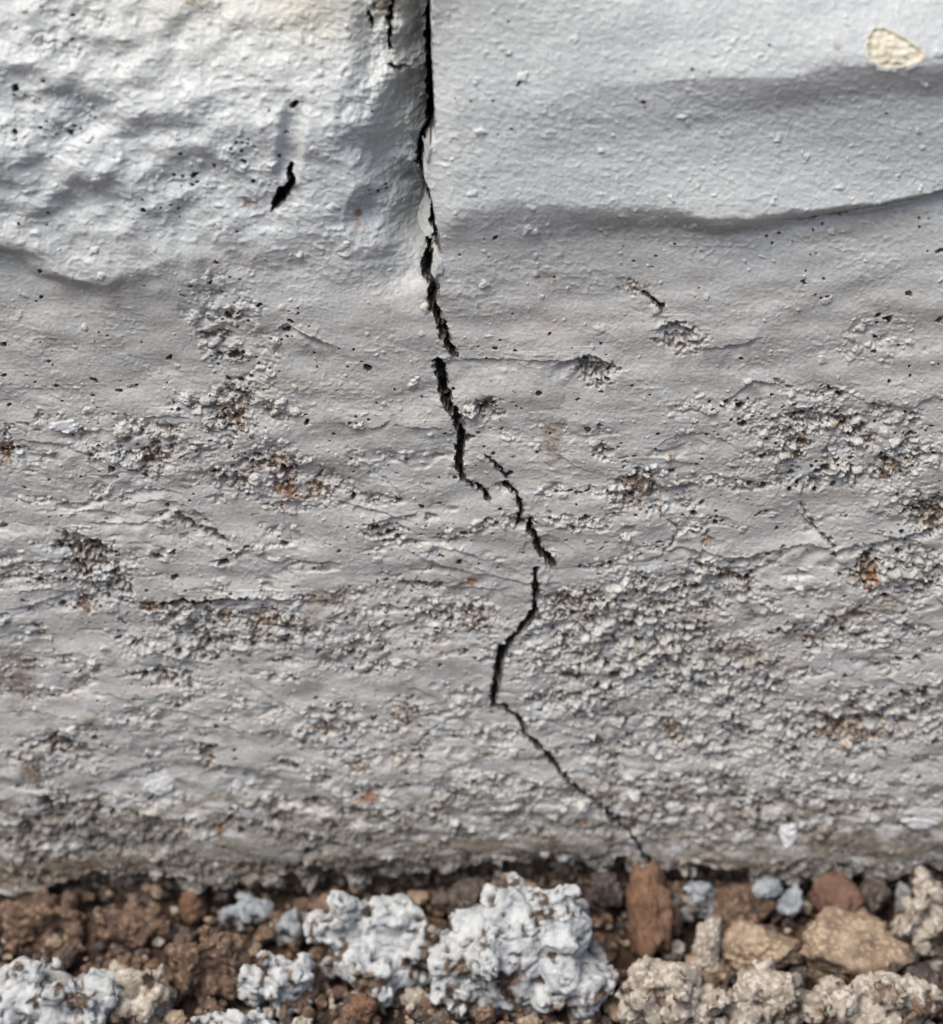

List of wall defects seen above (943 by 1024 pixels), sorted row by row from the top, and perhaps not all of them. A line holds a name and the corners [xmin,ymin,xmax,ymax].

crack [366,0,653,863]
peeling [866,27,924,71]